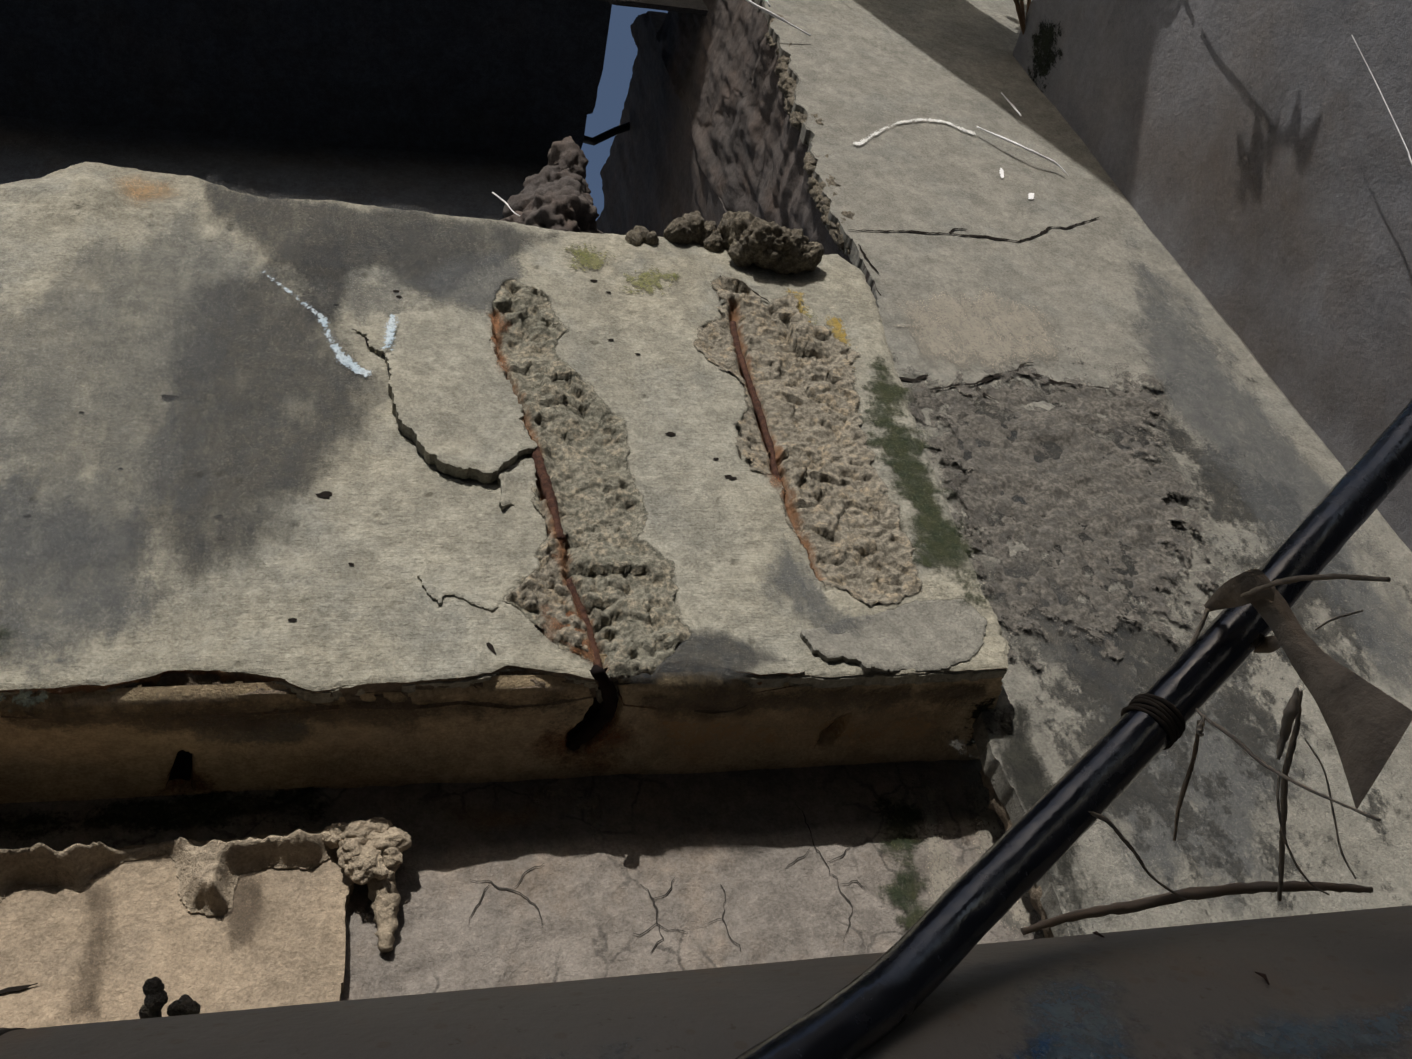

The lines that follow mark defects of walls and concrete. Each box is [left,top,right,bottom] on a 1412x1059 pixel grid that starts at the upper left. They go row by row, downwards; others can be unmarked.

water stain [1027,20,1064,92]
flaking render [765,14,858,257]
crack [849,217,1099,273]
water stain [0,180,530,667]
spalling [0,280,698,751]
corrosion [567,687,617,740]
spalling [717,666,805,695]
water stain [0,787,412,1015]
crack [469,863,544,923]
crack [634,877,741,952]
crack [785,806,865,941]
water stain [1004,892,1041,928]